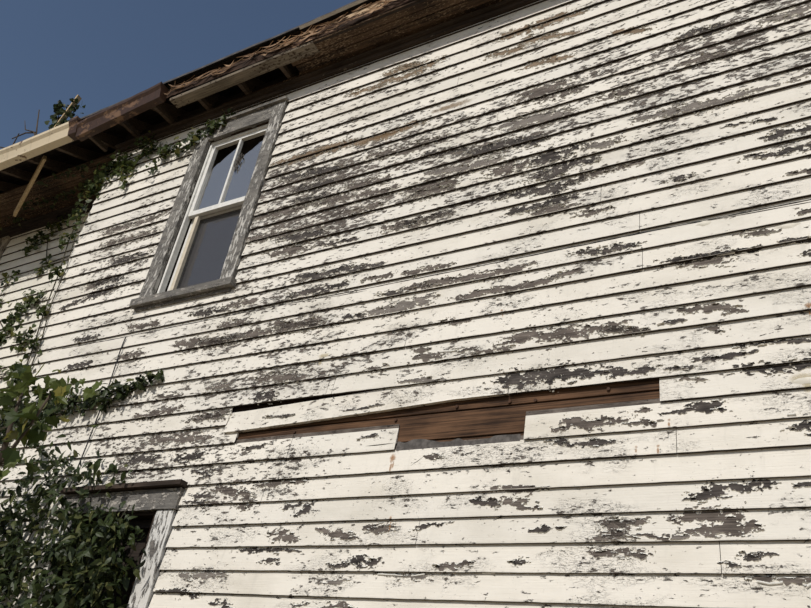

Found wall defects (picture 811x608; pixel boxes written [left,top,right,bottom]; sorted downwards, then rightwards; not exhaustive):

peeling [253,75,646,221]
peeling [57,212,167,311]
peeling [653,226,811,270]
peeling [168,261,585,356]
peeling [397,301,811,393]
peeling [545,400,732,449]
peeling [236,528,302,566]
peeling [315,521,454,542]
peeling [325,553,476,582]
peeling [469,484,551,512]
peeling [586,476,811,563]
peeling [717,550,811,587]